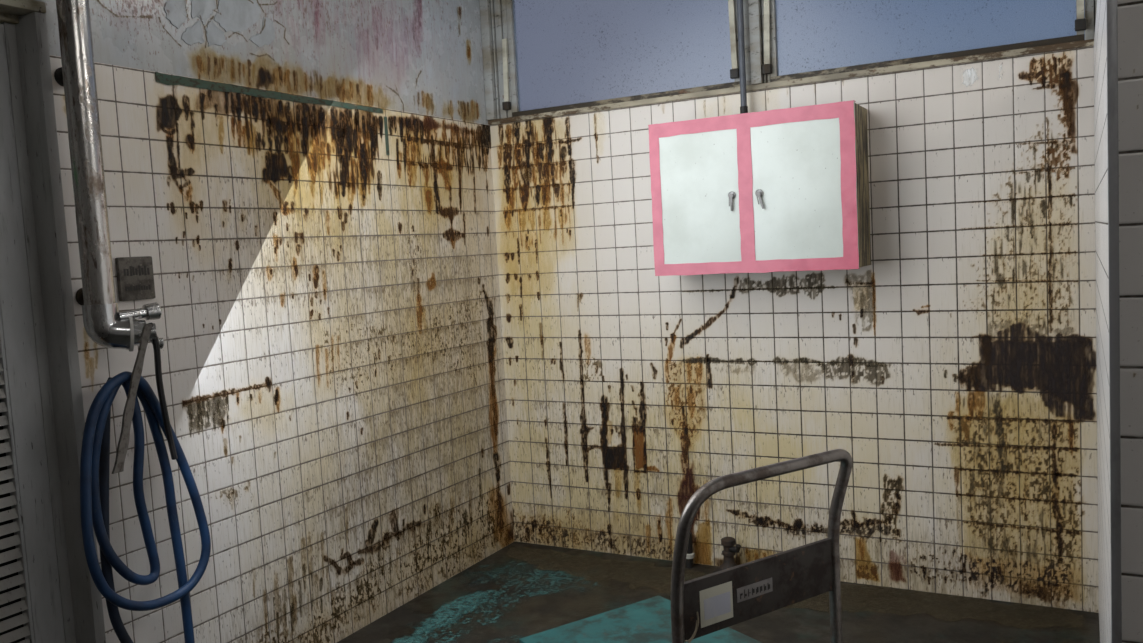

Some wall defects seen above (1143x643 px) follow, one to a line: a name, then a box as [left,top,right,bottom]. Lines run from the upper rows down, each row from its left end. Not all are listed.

peeling [164,0,275,47]
water stain [182,377,291,436]
rust [157,56,580,540]
rust [563,277,739,556]
water stain [683,273,890,385]
water stain [785,117,1096,628]
water stain [252,468,705,643]
water stain [727,475,903,542]